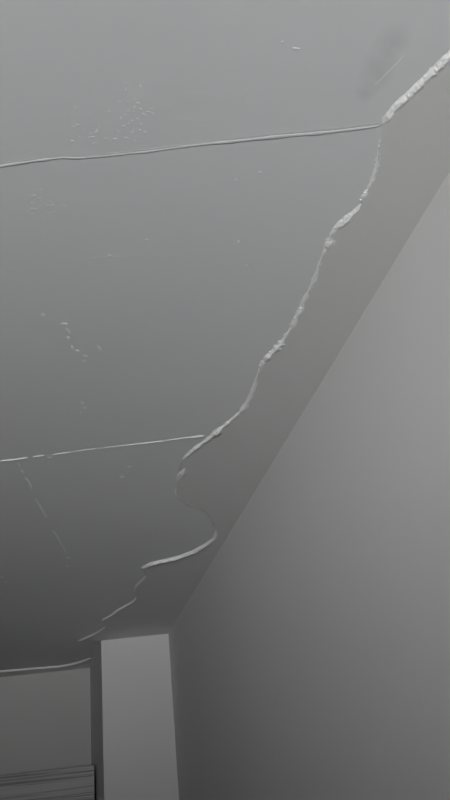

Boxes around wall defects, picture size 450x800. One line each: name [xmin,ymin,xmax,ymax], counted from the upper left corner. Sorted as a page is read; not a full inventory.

crack [0,49,450,641]